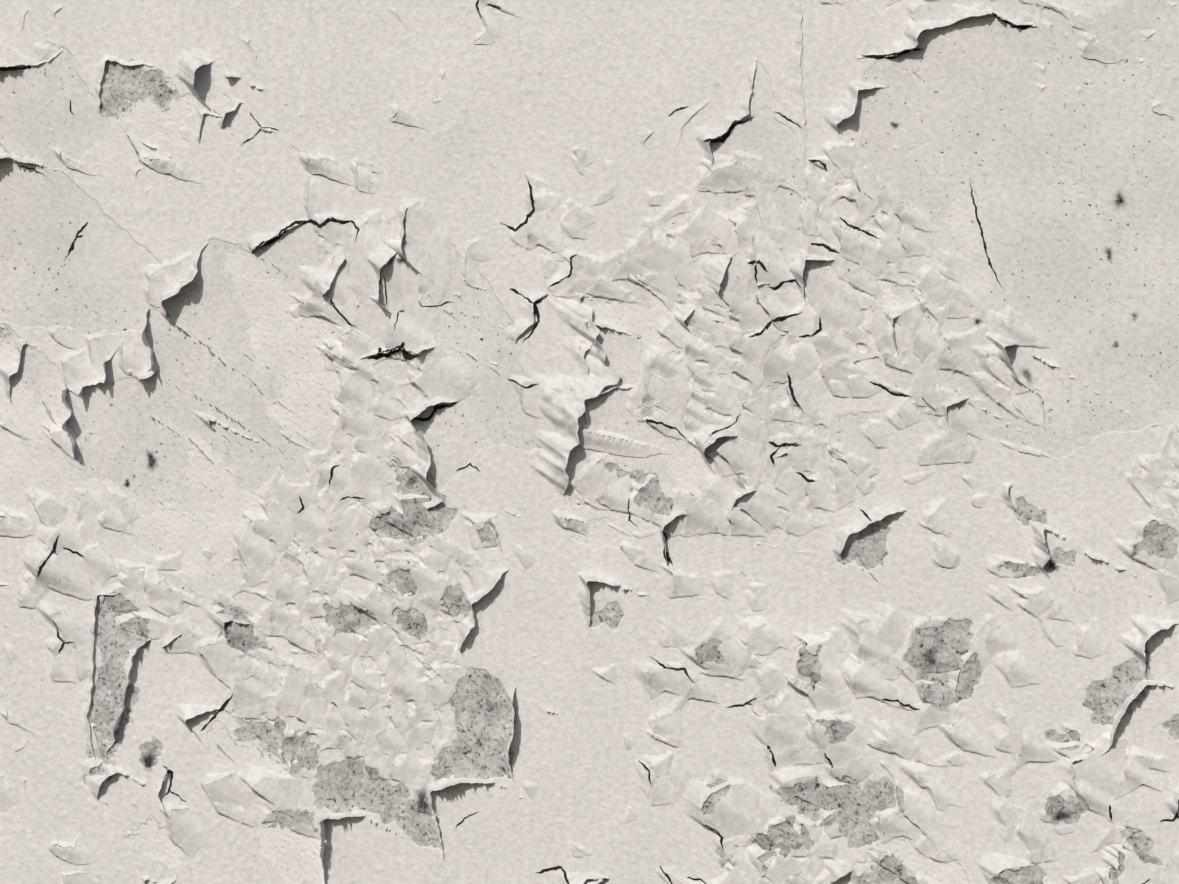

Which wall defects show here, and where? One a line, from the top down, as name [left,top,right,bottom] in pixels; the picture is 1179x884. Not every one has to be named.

crack [969,182,1001,286]
peeling [200,572,518,884]
peeling [48,833,102,884]
peeling [119,767,208,884]
peeling [556,840,610,884]